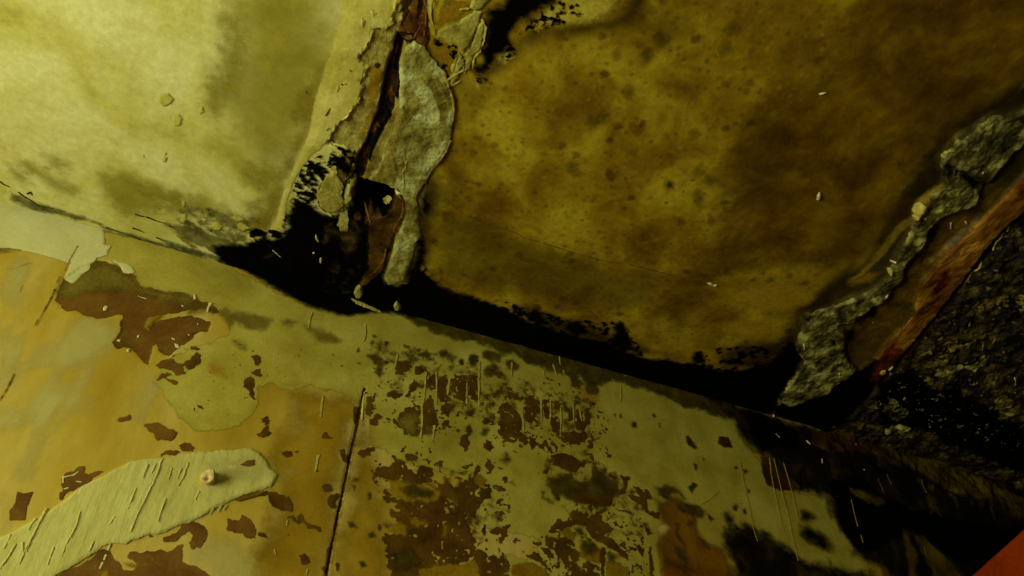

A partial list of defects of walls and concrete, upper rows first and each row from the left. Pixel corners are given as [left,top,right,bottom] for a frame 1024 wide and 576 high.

peeling [9,492,33,520]
damp [211,0,312,167]
spalling [268,0,490,285]
peeling [55,232,890,576]
damp [103,139,1024,576]
damp [421,0,1024,370]
peeling [903,531,961,576]
rust [871,178,1024,381]